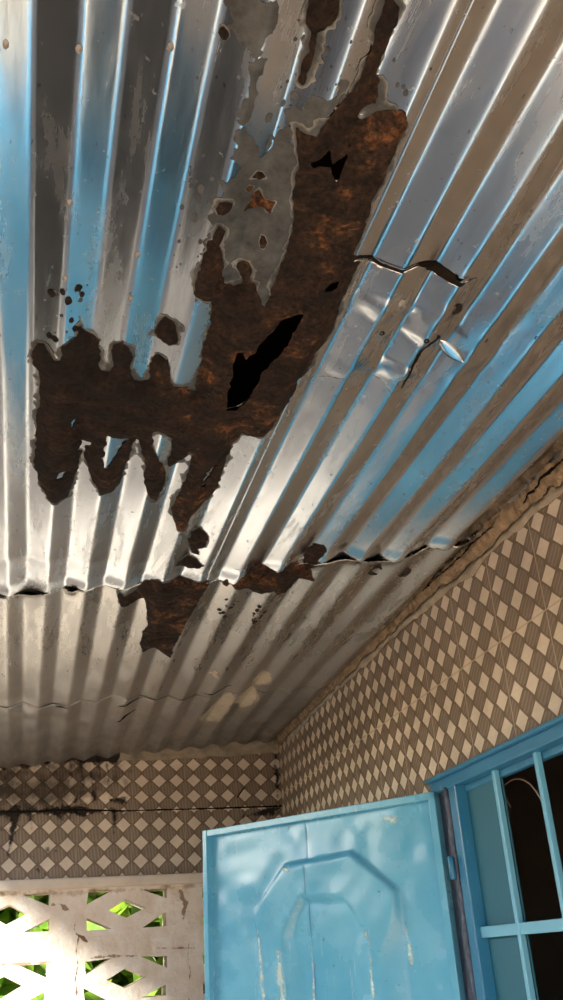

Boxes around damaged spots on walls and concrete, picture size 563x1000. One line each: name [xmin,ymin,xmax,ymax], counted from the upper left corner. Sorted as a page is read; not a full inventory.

corrosion [27,0,409,658]